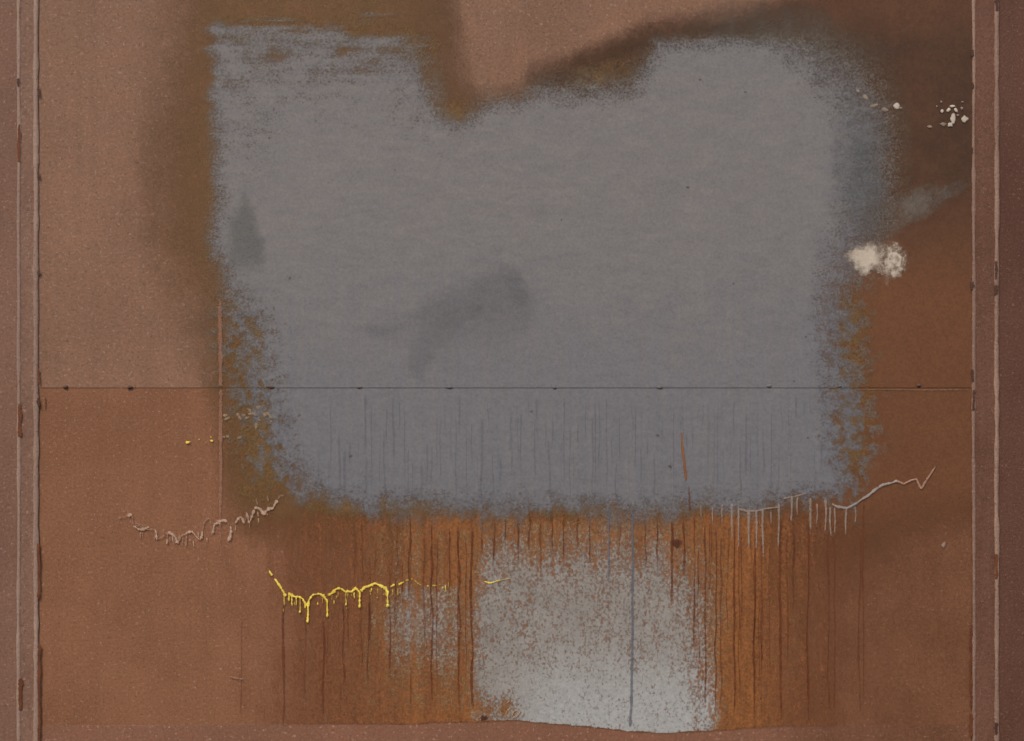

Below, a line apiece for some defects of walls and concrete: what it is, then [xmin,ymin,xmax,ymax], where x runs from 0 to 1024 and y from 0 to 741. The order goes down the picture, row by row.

water stain [172,0,972,571]
rust [282,433,838,732]